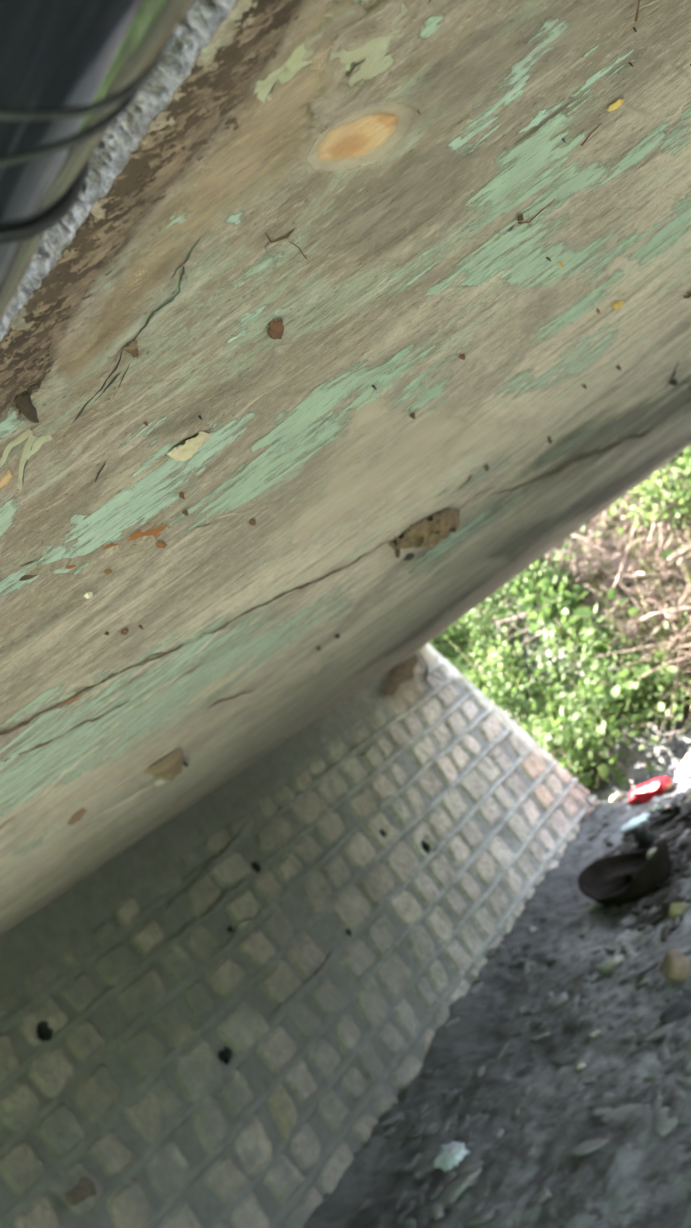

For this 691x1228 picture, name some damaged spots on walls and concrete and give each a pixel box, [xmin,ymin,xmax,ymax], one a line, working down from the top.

spalling [0,0,236,341]
damp [0,0,334,423]
flaking render [307,0,408,133]
peeling [420,14,444,39]
peeling [448,18,569,153]
peeling [425,49,691,344]
crack [0,237,203,490]
peeling [0,340,470,596]
crack [458,421,668,508]
peeling [0,586,352,818]
crack [0,535,396,762]
crack [418,652,443,690]